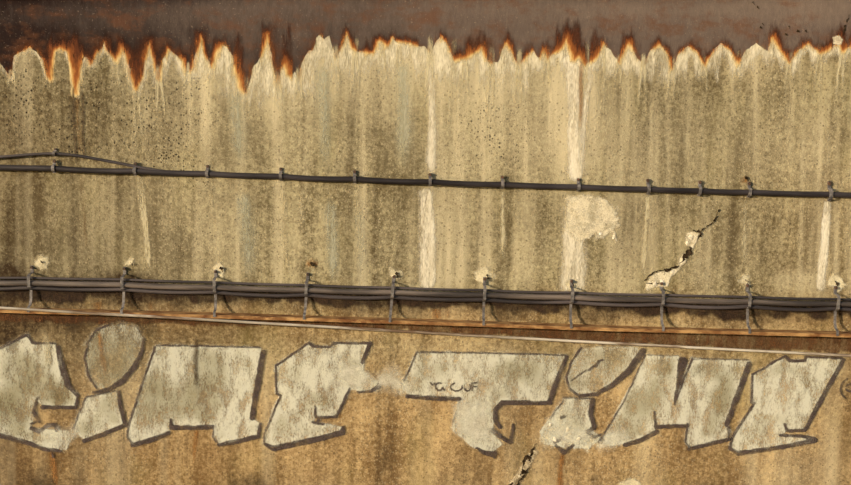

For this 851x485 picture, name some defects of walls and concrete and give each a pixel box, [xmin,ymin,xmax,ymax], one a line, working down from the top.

corrosion [41,32,224,97]
corrosion [440,33,493,63]
corrosion [500,23,605,67]
corrosion [652,38,741,71]
corrosion [768,26,851,63]
damp [73,35,851,181]
damp [137,178,150,264]
damp [420,189,436,288]
damp [562,196,586,291]
crack [644,209,720,284]
damp [817,201,830,290]
crack [509,443,537,485]